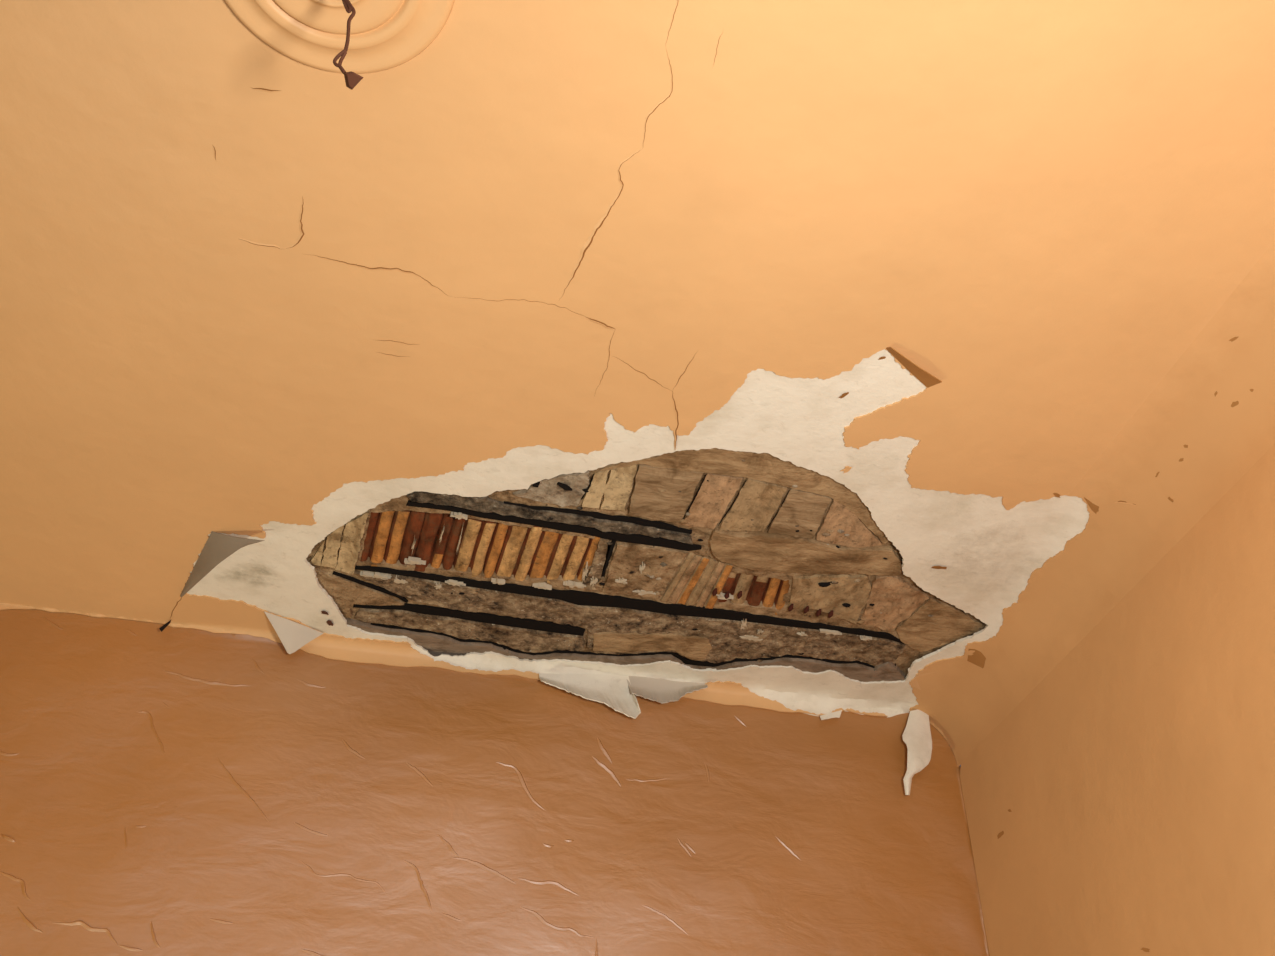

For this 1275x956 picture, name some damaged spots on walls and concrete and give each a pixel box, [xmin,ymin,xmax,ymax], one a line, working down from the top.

crack [241,0,698,450]
spalling [180,347,1099,720]